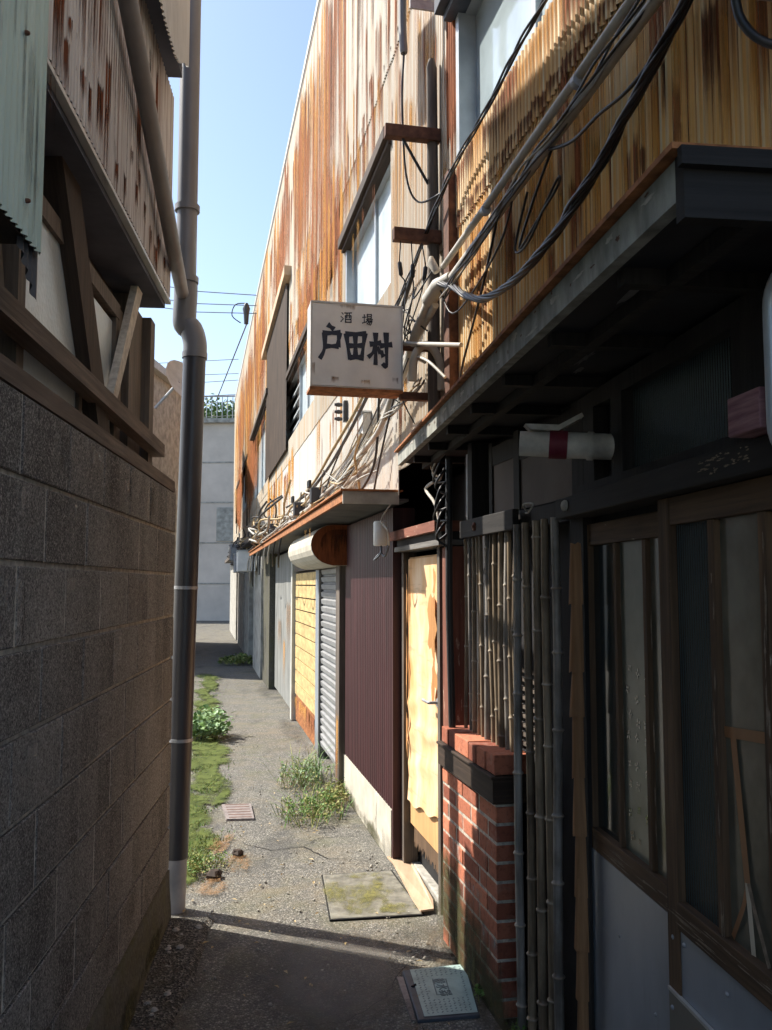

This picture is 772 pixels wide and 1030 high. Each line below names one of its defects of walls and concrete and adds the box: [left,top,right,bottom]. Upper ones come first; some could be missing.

corrosion [50,0,146,214]
corrosion [149,227,166,269]
corrosion [235,0,423,524]
corrosion [419,0,769,357]
crack [244,836,366,861]